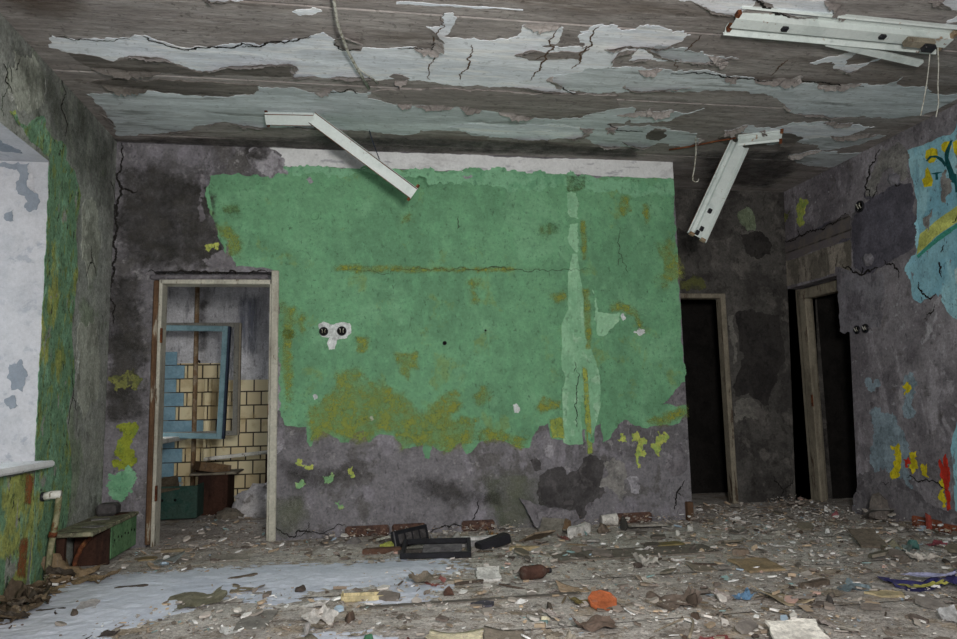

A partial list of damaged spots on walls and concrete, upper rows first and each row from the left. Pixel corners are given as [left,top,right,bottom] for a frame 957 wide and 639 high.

crack [427,13,445,80]
crack [530,29,558,81]
crack [571,27,599,69]
peeling [0,140,40,221]
crack [86,143,138,323]
leakage [115,167,222,272]
leakage [114,137,345,160]
leakage [356,138,636,157]
peeling [48,0,957,336]
leakage [107,274,148,421]
peeling [309,372,524,451]
spalling [530,368,640,519]